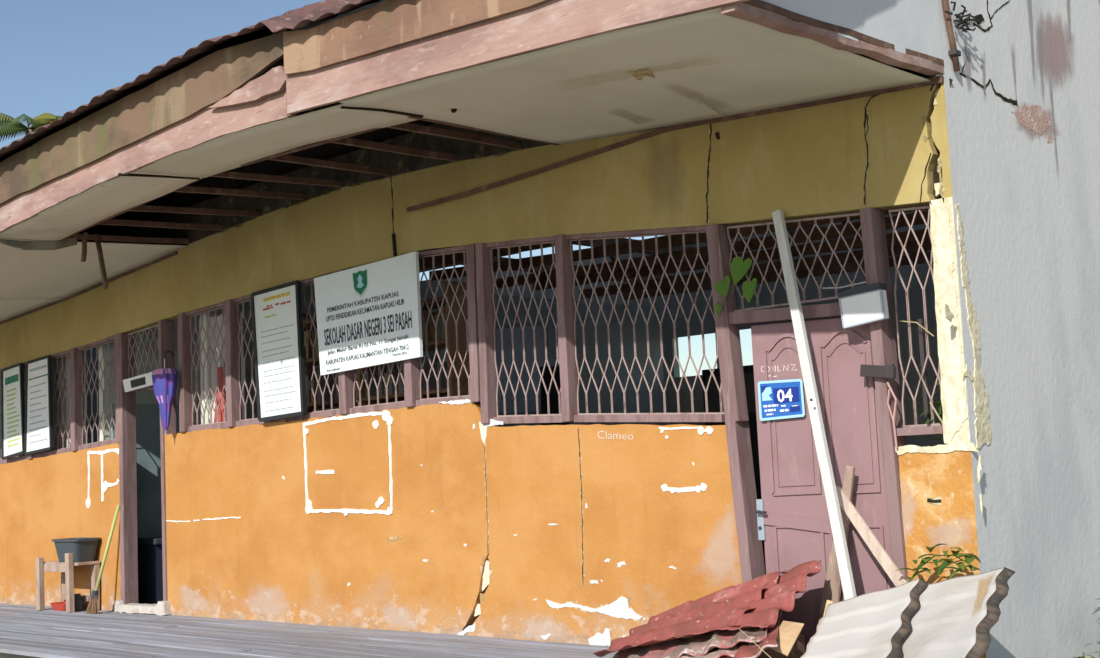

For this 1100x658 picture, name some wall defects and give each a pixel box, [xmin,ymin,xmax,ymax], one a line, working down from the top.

crack [388,177,396,234]
crack [705,123,720,223]
crack [862,94,881,205]
crack [920,0,1018,202]
spalling [1012,104,1054,143]
flaking render [895,203,992,515]
crack [457,422,492,635]
crack [577,428,585,586]
peeling [533,596,647,646]